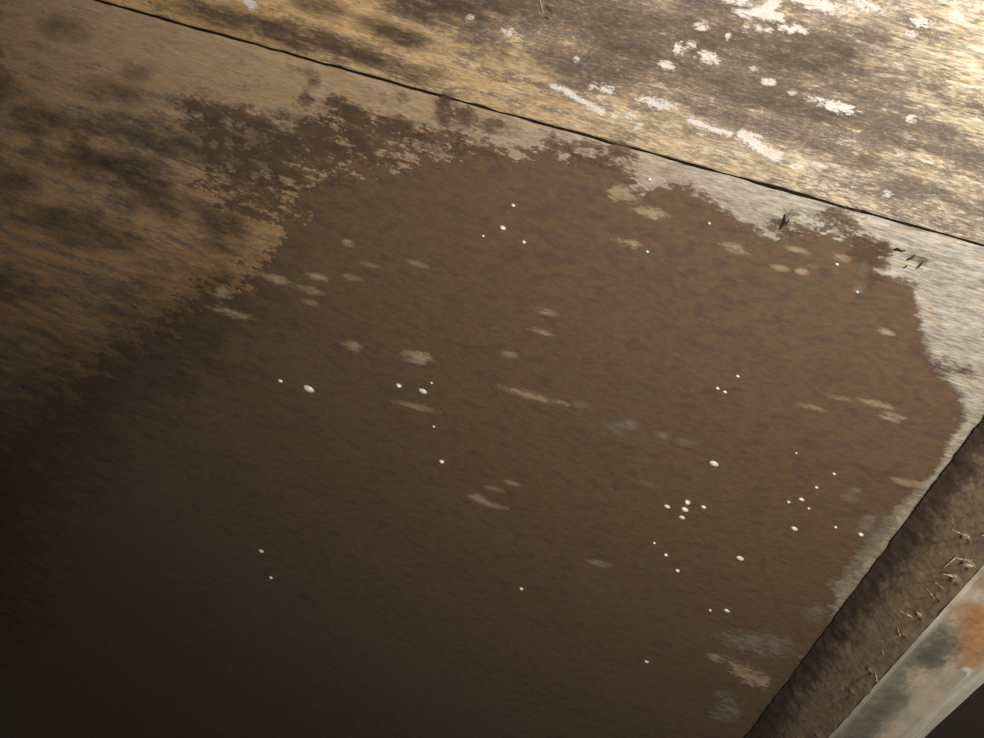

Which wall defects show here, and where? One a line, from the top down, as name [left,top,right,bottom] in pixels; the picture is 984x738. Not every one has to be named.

damp [396,0,505,21]
damp [186,0,296,48]
damp [368,23,423,47]
damp [307,36,383,67]
damp [184,98,276,144]
damp [436,92,474,126]
damp [201,168,247,194]
crack [779,214,790,229]
damp [935,359,974,374]